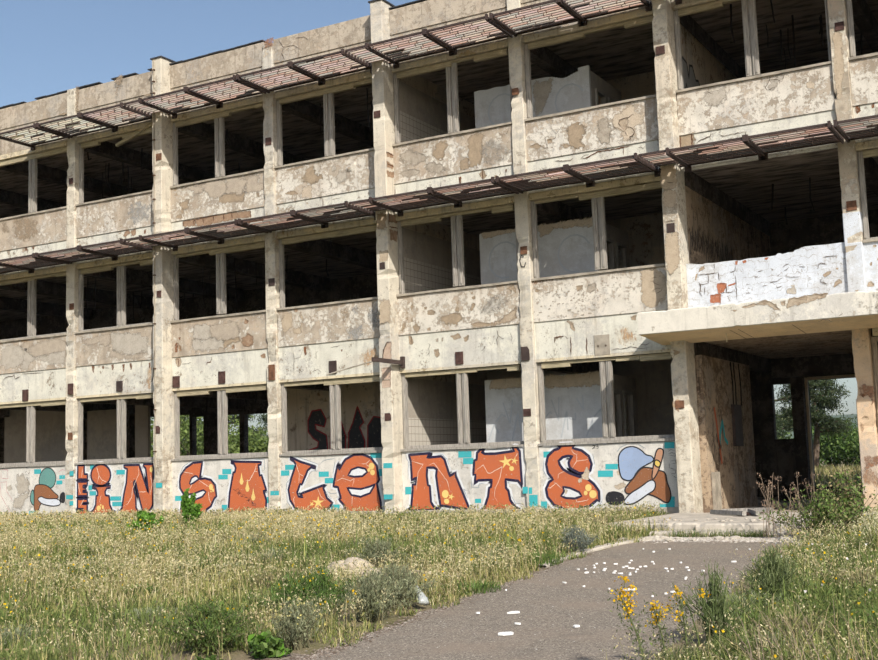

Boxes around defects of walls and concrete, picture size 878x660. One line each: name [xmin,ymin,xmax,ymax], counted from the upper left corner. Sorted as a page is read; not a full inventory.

peeling [701,85,727,107]
peeling [562,104,645,149]
peeling [386,140,450,178]
peeling [459,132,485,171]
peeling [285,165,348,199]
flaking render [710,282,735,303]
peeling [192,319,254,352]